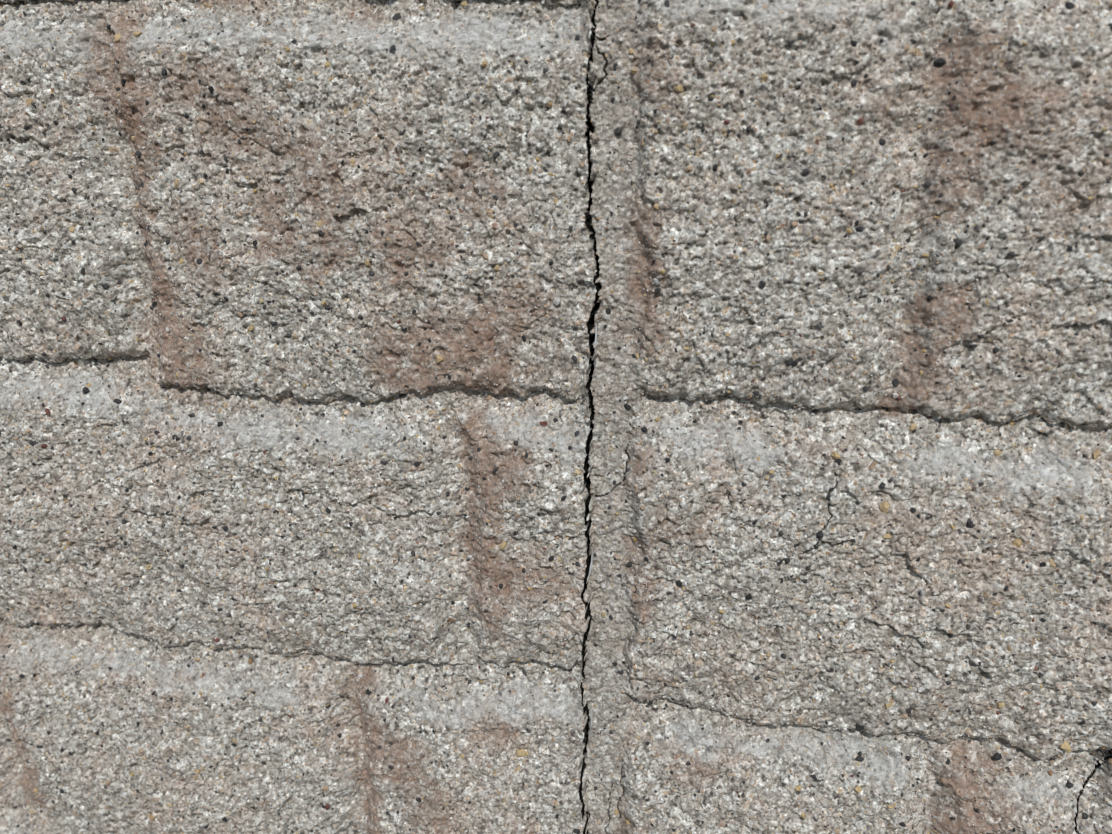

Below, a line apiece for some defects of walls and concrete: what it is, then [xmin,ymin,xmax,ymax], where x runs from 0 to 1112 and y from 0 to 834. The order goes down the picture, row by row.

crack [579,0,630,834]
crack [1073,749,1112,834]